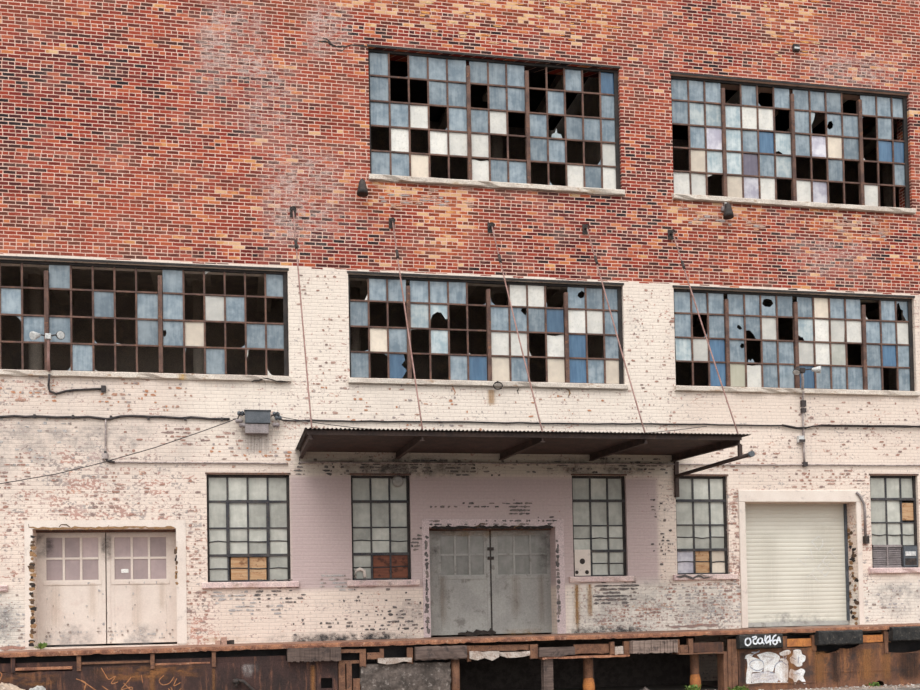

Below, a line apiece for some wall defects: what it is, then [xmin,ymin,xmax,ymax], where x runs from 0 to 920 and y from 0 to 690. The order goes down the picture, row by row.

peeling [0,376,57,402]
peeling [0,441,51,508]
peeling [81,468,145,516]
peeling [161,424,305,475]
peeling [430,502,557,529]
peeling [789,467,869,488]
peeling [830,401,910,456]
spalling [0,518,174,646]
peeling [174,506,306,631]
spalling [320,520,452,637]
peeling [593,490,741,630]
spalling [847,528,920,625]